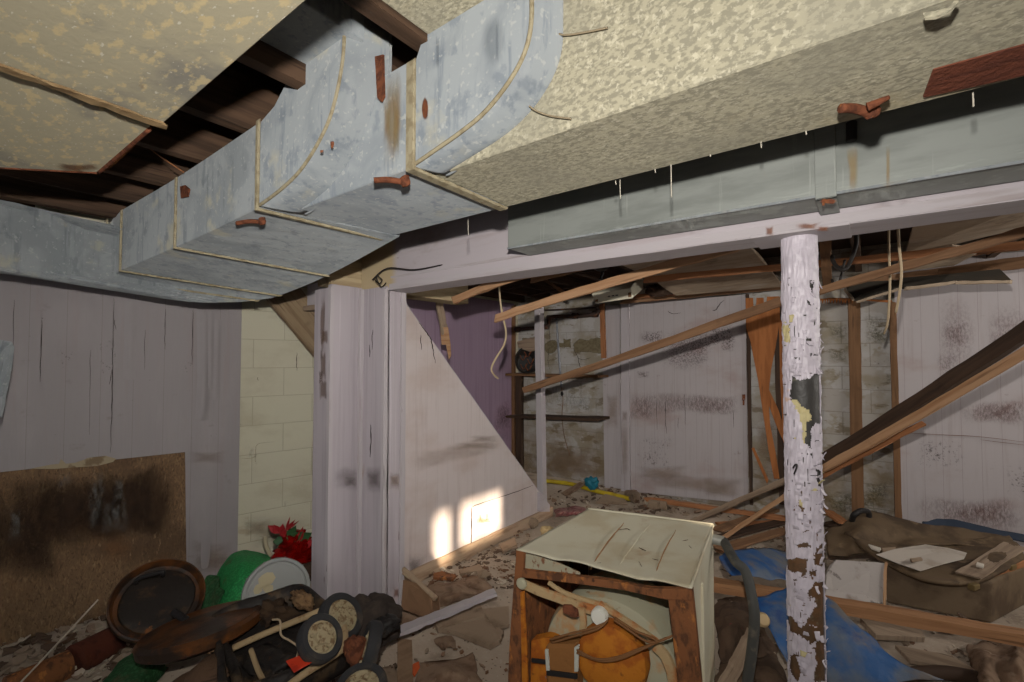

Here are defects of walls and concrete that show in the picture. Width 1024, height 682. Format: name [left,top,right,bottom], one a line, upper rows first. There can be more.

peeling [793,452,828,564]
peeling [794,619,830,669]